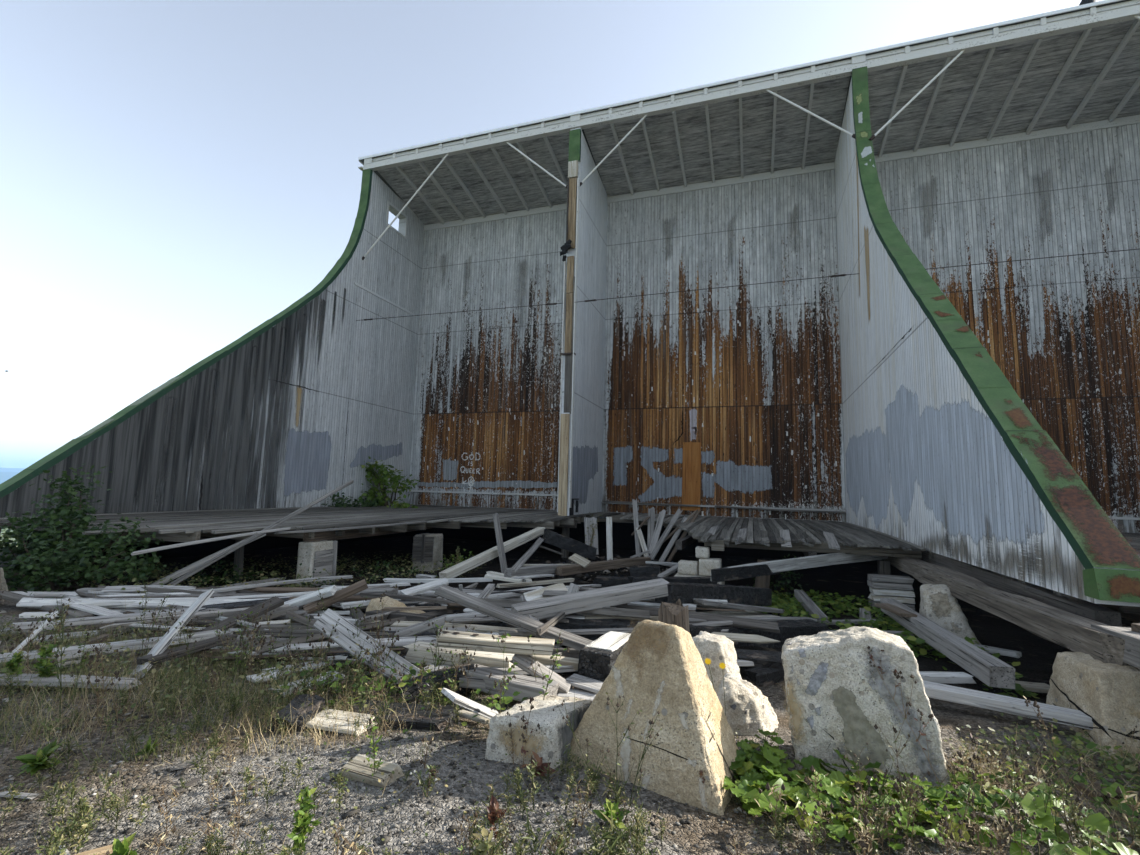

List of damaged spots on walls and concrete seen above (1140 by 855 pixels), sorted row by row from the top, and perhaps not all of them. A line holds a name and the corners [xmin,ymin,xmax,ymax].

leakage [0,288,346,518]
rust [1004,399,1140,599]